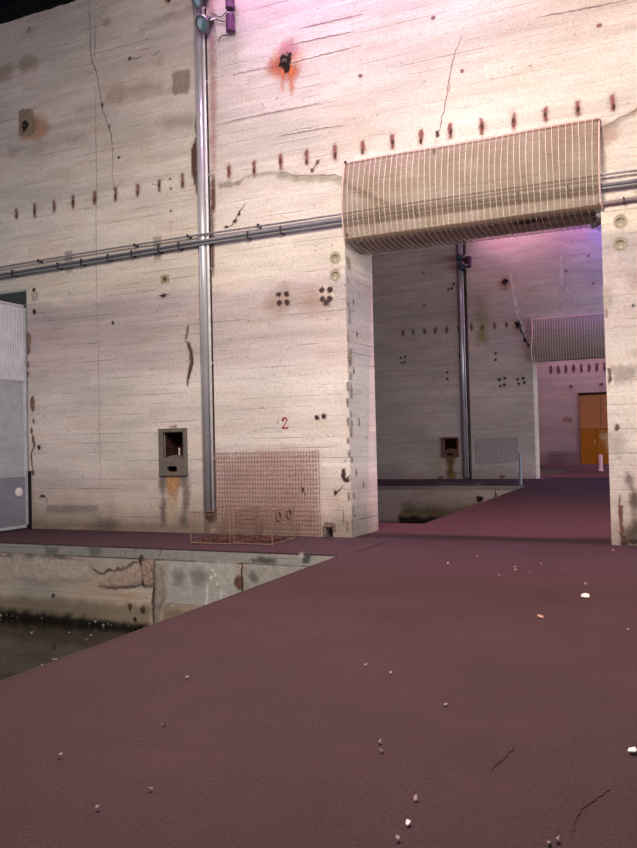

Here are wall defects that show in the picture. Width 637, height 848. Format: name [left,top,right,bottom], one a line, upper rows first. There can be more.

rust [272,52,293,88]
rust [18,109,34,135]
crack [89,11,115,202]
crack [433,37,462,154]
rust [160,476,188,523]
peeling [0,553,164,624]
damp [0,599,148,629]